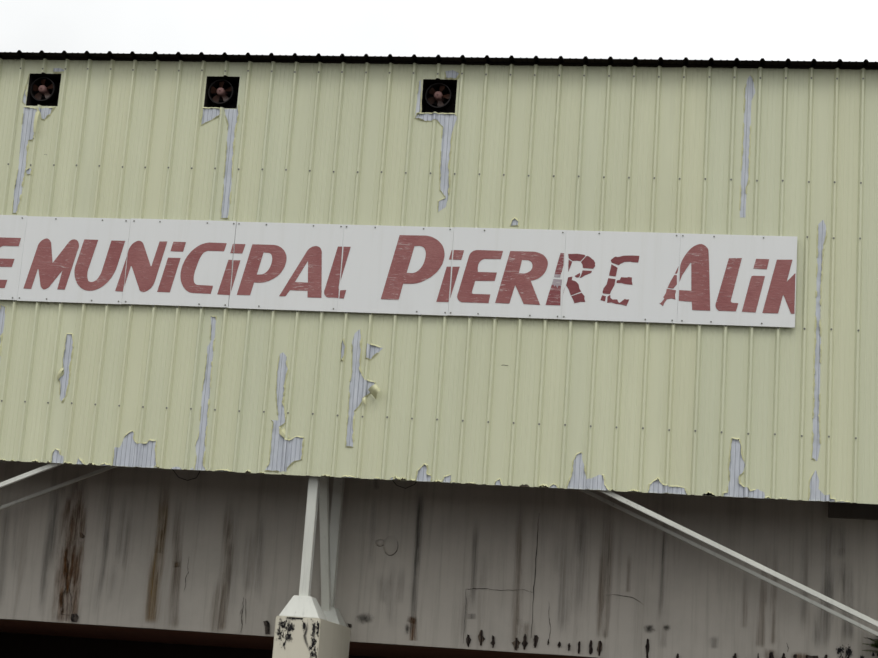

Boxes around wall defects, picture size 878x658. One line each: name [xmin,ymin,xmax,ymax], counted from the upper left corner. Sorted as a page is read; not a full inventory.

peeling [12,74,56,214]
peeling [200,105,240,220]
peeling [414,80,457,212]
peeling [32,430,159,468]
peeling [171,316,232,472]
peeling [245,352,305,474]
peeling [340,329,383,448]
peeling [520,451,613,491]
peeling [628,477,688,495]
peeling [703,437,789,500]
peeling [808,220,850,503]
rust [57,500,85,619]